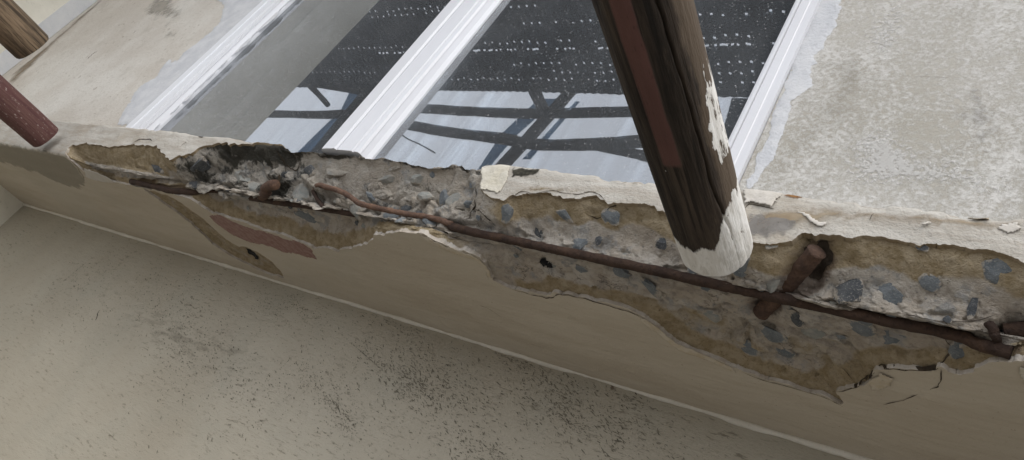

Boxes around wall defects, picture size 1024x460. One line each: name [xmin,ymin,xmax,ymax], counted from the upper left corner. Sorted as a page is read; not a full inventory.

rust [129,179,218,195]
rust [248,196,355,217]
peeling [848,129,1001,192]
spalling [67,144,1024,400]
rust [447,223,1024,360]
crack [745,314,998,406]